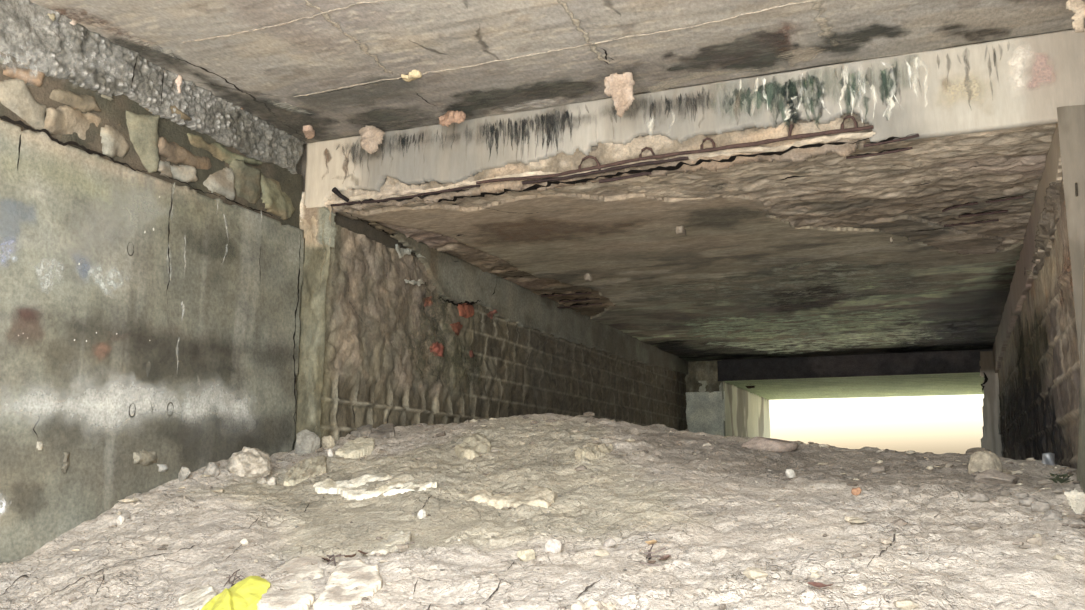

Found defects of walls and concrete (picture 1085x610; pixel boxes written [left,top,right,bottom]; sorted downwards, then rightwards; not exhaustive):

water stain [819,25,904,52]
peeling [1066,0,1085,33]
water stain [113,38,594,167]
water stain [613,88,715,119]
peeling [604,71,737,117]
water stain [664,31,918,131]
rust [330,115,919,206]
spalling [325,118,1066,318]
water stain [15,385,281,457]